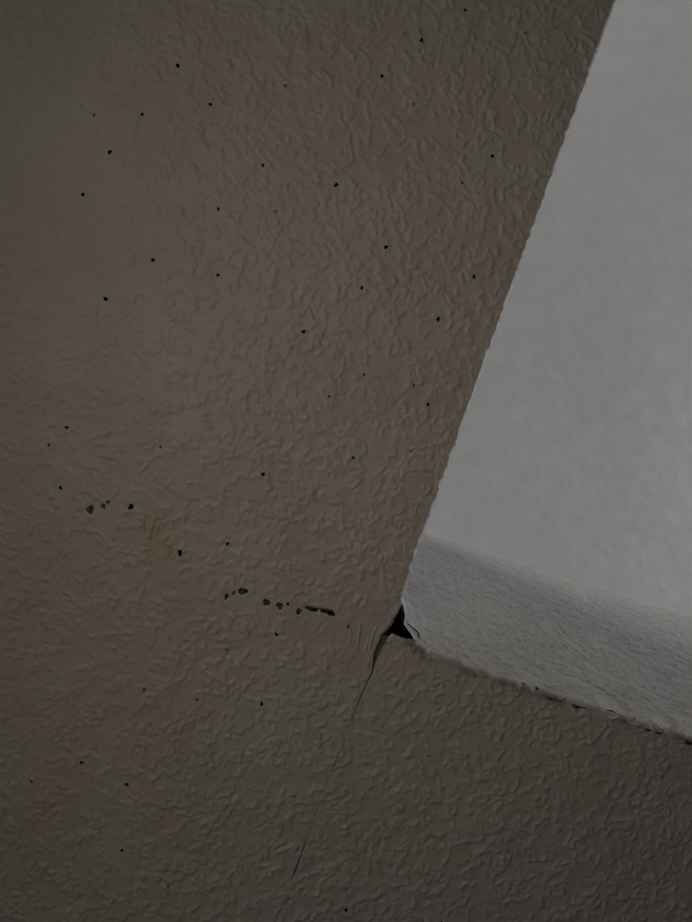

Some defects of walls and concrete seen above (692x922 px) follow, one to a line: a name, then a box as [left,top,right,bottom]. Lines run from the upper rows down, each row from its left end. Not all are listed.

crack [275,666,374,922]